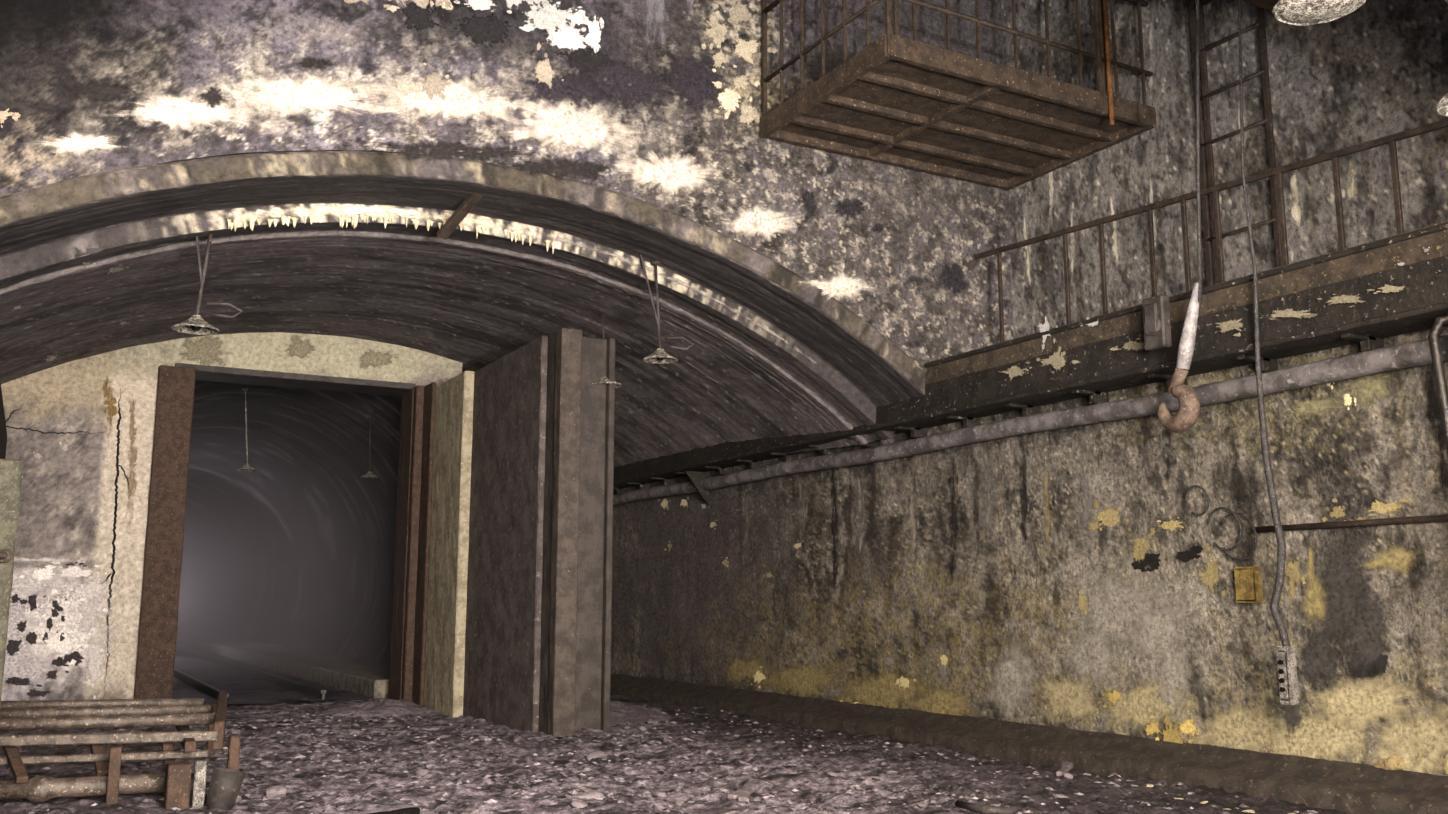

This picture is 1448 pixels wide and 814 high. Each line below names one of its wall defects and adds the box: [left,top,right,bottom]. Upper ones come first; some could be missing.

spalling [0,108,21,128]
peeling [397,63,451,101]
peeling [344,0,616,89]
peeling [1037,315,1058,350]
leakage [830,468,839,588]
leakage [908,493,919,557]
leakage [949,463,961,575]
leakage [1019,442,1052,543]
leakage [1165,430,1175,480]
leakage [1426,367,1448,492]
peeling [1,557,117,701]
leakage [723,654,977,716]